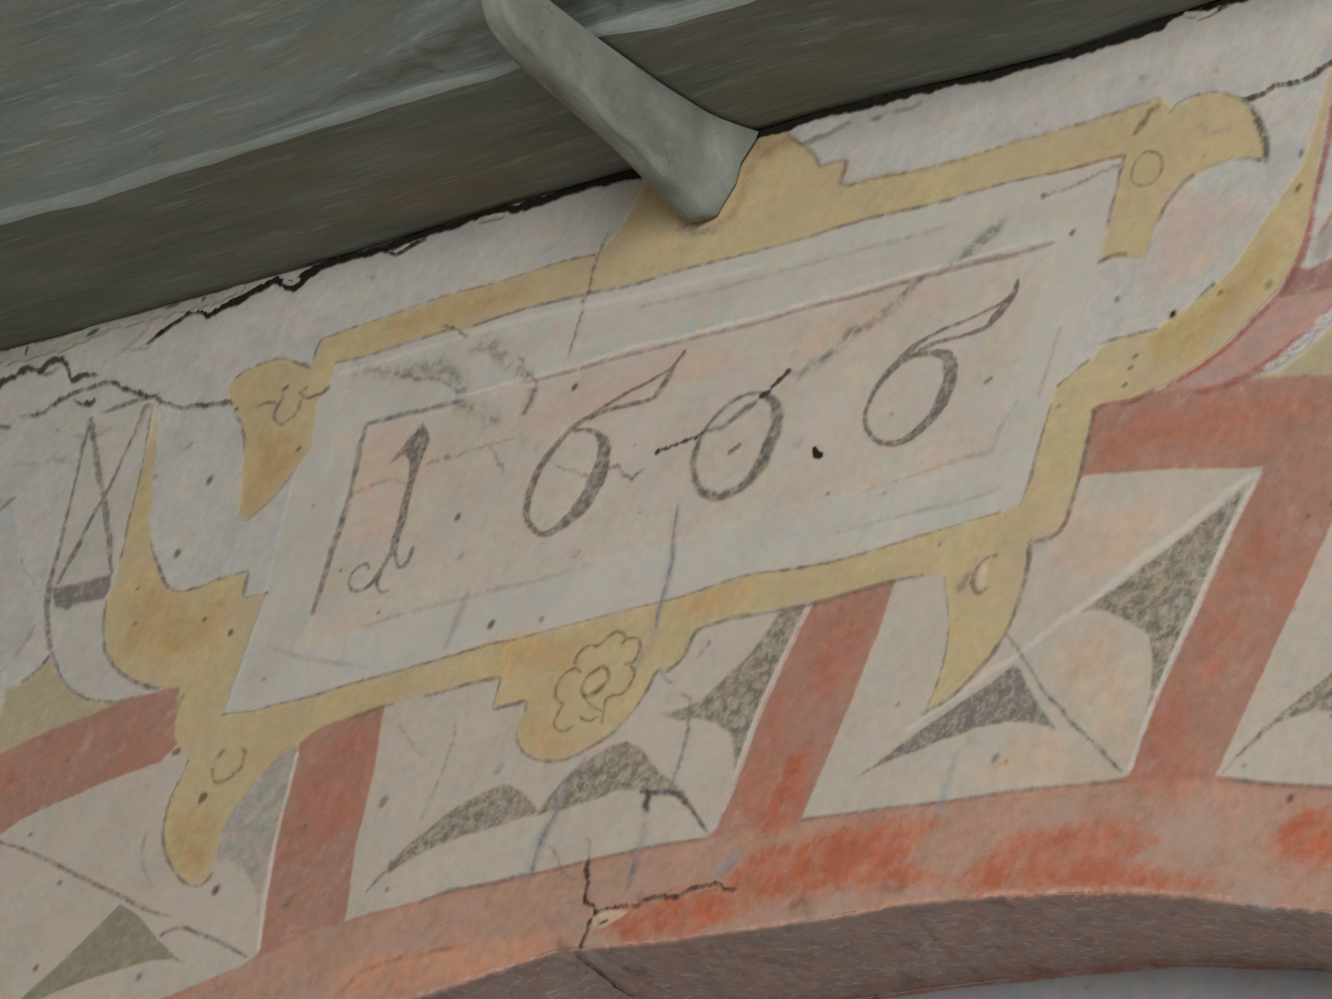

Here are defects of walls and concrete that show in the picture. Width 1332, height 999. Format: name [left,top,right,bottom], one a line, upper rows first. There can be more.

crack [755,0,1244,138]
crack [1244,60,1332,100]
crack [0,356,232,427]
crack [577,860,735,999]